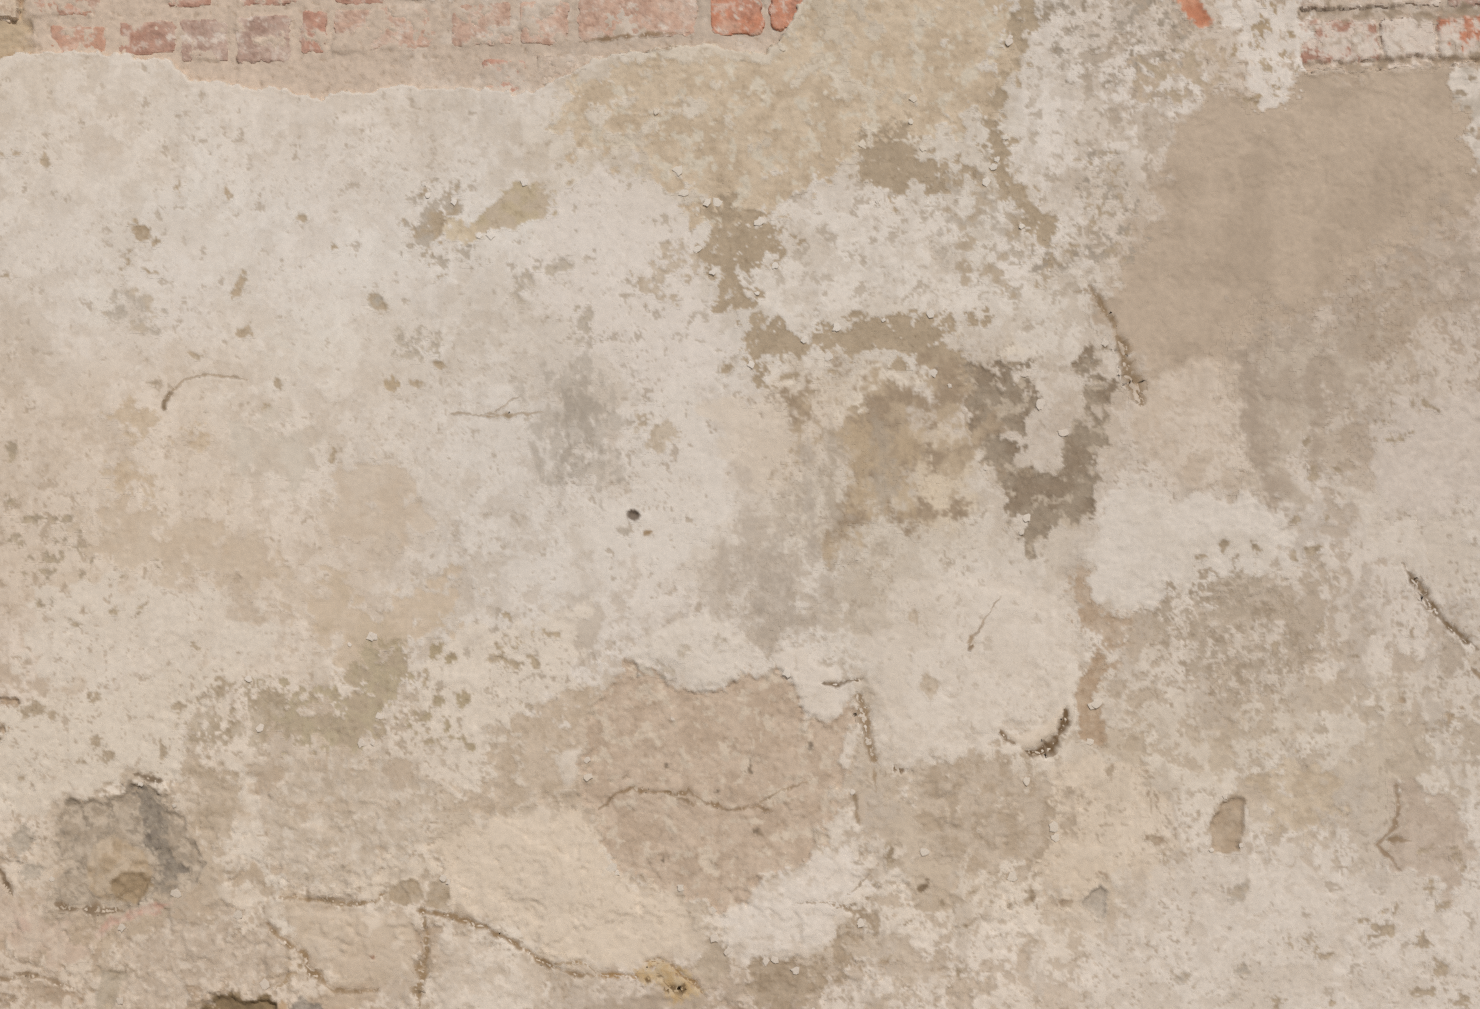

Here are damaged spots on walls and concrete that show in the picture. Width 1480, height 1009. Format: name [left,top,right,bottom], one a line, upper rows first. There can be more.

spalling [0,147,53,174]
spalling [228,268,252,301]
spalling [234,318,256,341]
spalling [362,290,451,396]
peeling [396,0,1297,562]
spalling [1301,435,1344,486]
crack [1401,562,1480,681]
spalling [0,372,905,1009]
peeling [900,537,1327,927]
spalling [1169,966,1201,992]
spalling [1283,932,1337,961]
spalling [1353,901,1480,1009]